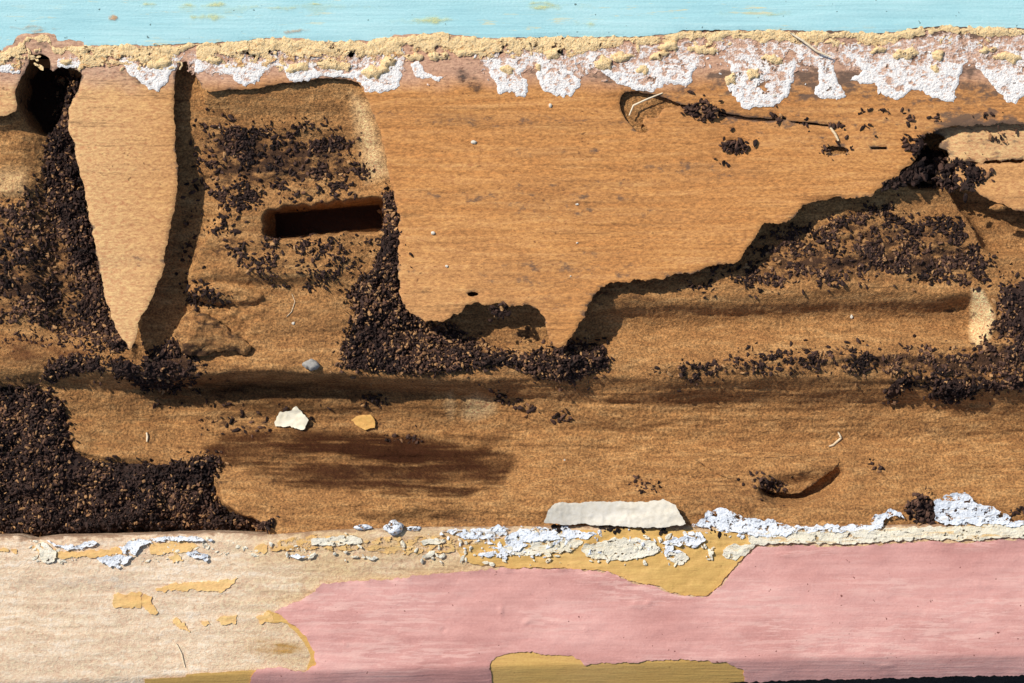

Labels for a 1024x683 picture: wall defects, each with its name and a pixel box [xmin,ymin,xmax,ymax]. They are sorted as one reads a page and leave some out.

peeling [0,24,1024,110]
crack [718,111,821,126]
peeling [351,415,375,430]
damp [204,430,512,497]
peeling [0,492,1024,596]
peeling [112,578,237,615]
peeling [201,615,237,626]
peeling [256,610,316,670]
peeling [145,670,256,683]
peeling [489,651,745,683]